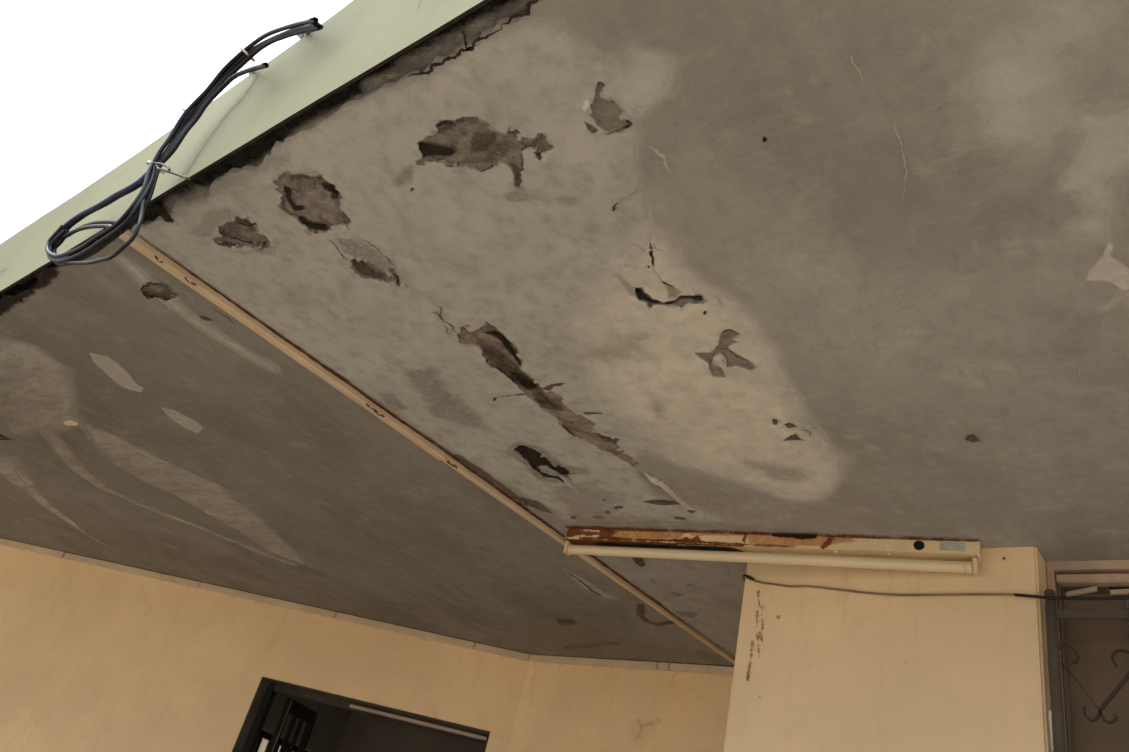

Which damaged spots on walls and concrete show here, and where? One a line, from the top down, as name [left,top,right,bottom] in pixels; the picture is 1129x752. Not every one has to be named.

spalling [130,0,554,230]
spalling [582,82,632,135]
spalling [195,211,278,254]
spalling [273,171,408,288]
spalling [0,263,59,316]
spalling [140,282,179,301]
spalling [611,233,707,315]
spalling [698,329,758,375]
spalling [431,307,639,465]
leakage [454,455,553,514]
spalling [507,444,583,497]
corrosion [132,231,980,658]